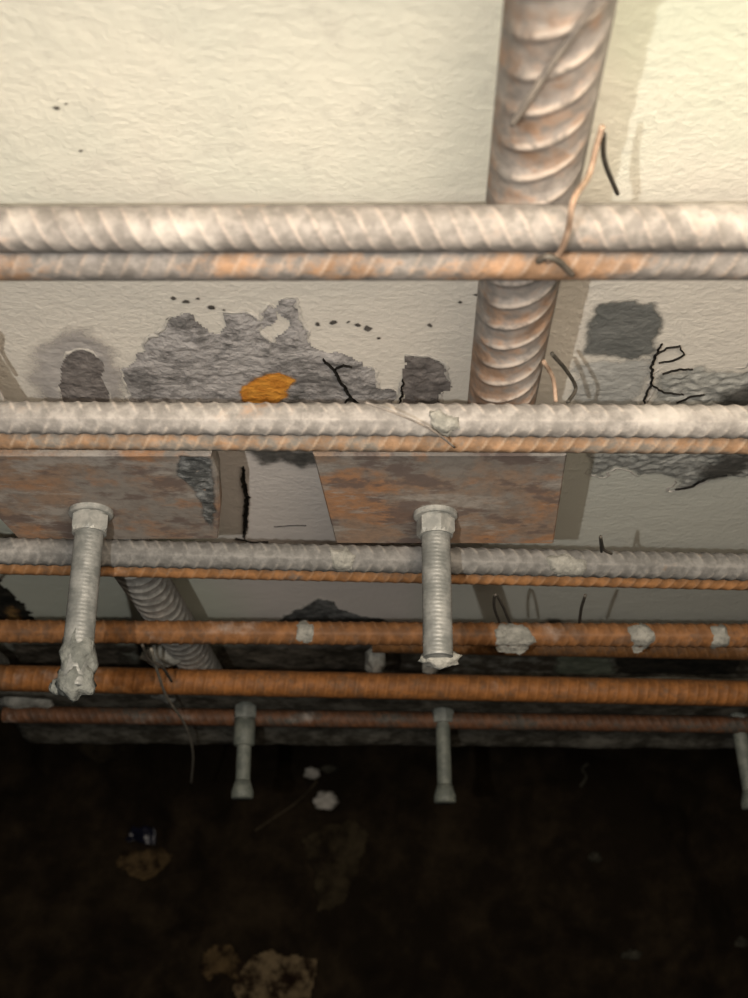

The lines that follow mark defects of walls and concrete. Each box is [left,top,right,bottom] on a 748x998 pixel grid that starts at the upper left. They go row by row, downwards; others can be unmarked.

spalling [0,0,748,492]
corrosion [240,373,295,403]
crack [643,343,705,404]